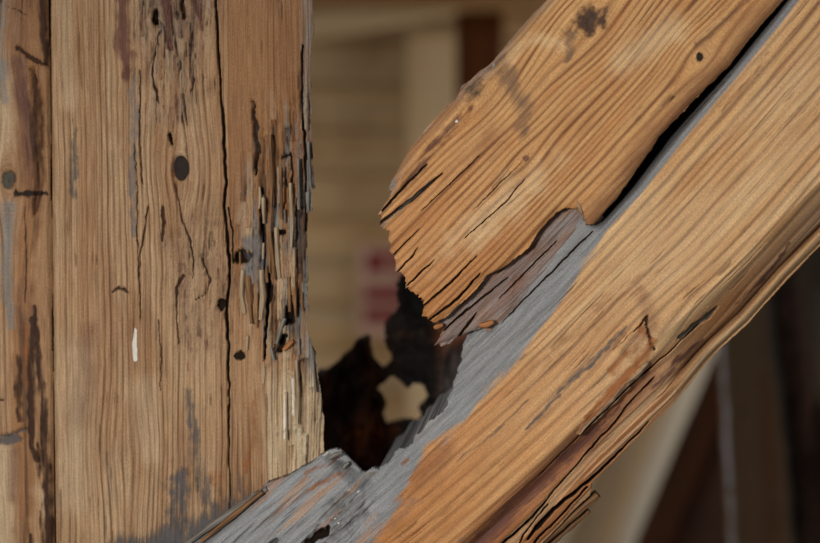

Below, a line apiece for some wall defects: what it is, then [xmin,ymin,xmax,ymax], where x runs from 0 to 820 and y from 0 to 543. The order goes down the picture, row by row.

crack [215,0,235,496]
peeling [238,142,312,440]
crack [379,155,480,286]
crack [465,174,524,238]
crack [423,231,593,336]
crack [502,315,699,543]